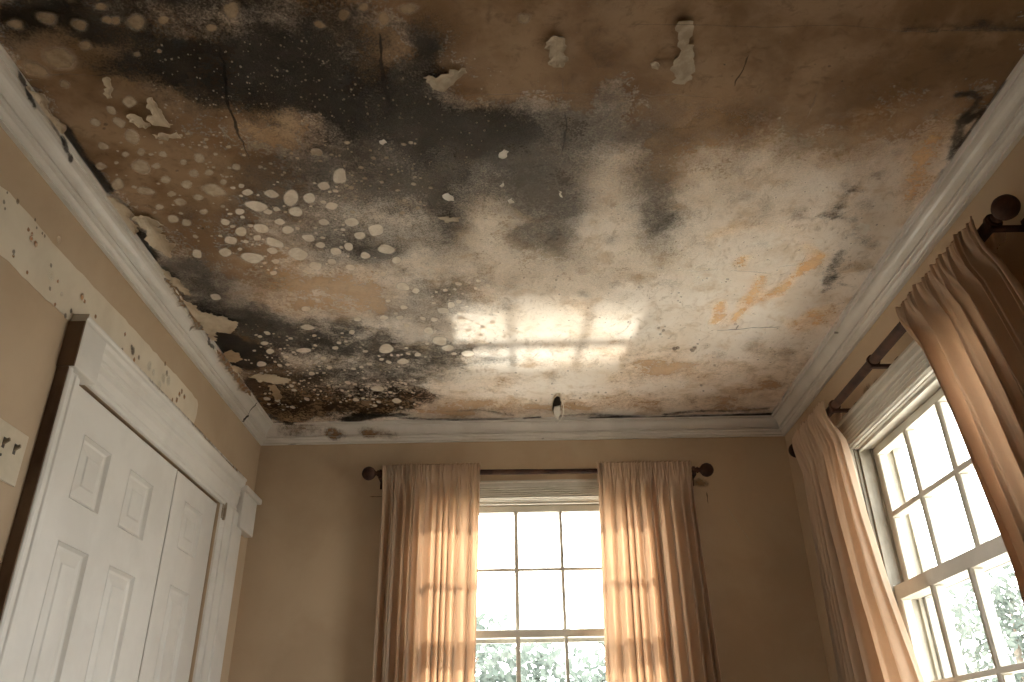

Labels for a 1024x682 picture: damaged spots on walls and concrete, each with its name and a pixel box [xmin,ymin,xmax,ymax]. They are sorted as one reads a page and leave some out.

crack [218,44,249,157]
flaking render [424,68,467,92]
flaking render [544,35,568,68]
flaking render [650,20,695,85]
peeling [0,186,198,423]
peeling [106,195,238,341]
water stain [0,0,1024,440]